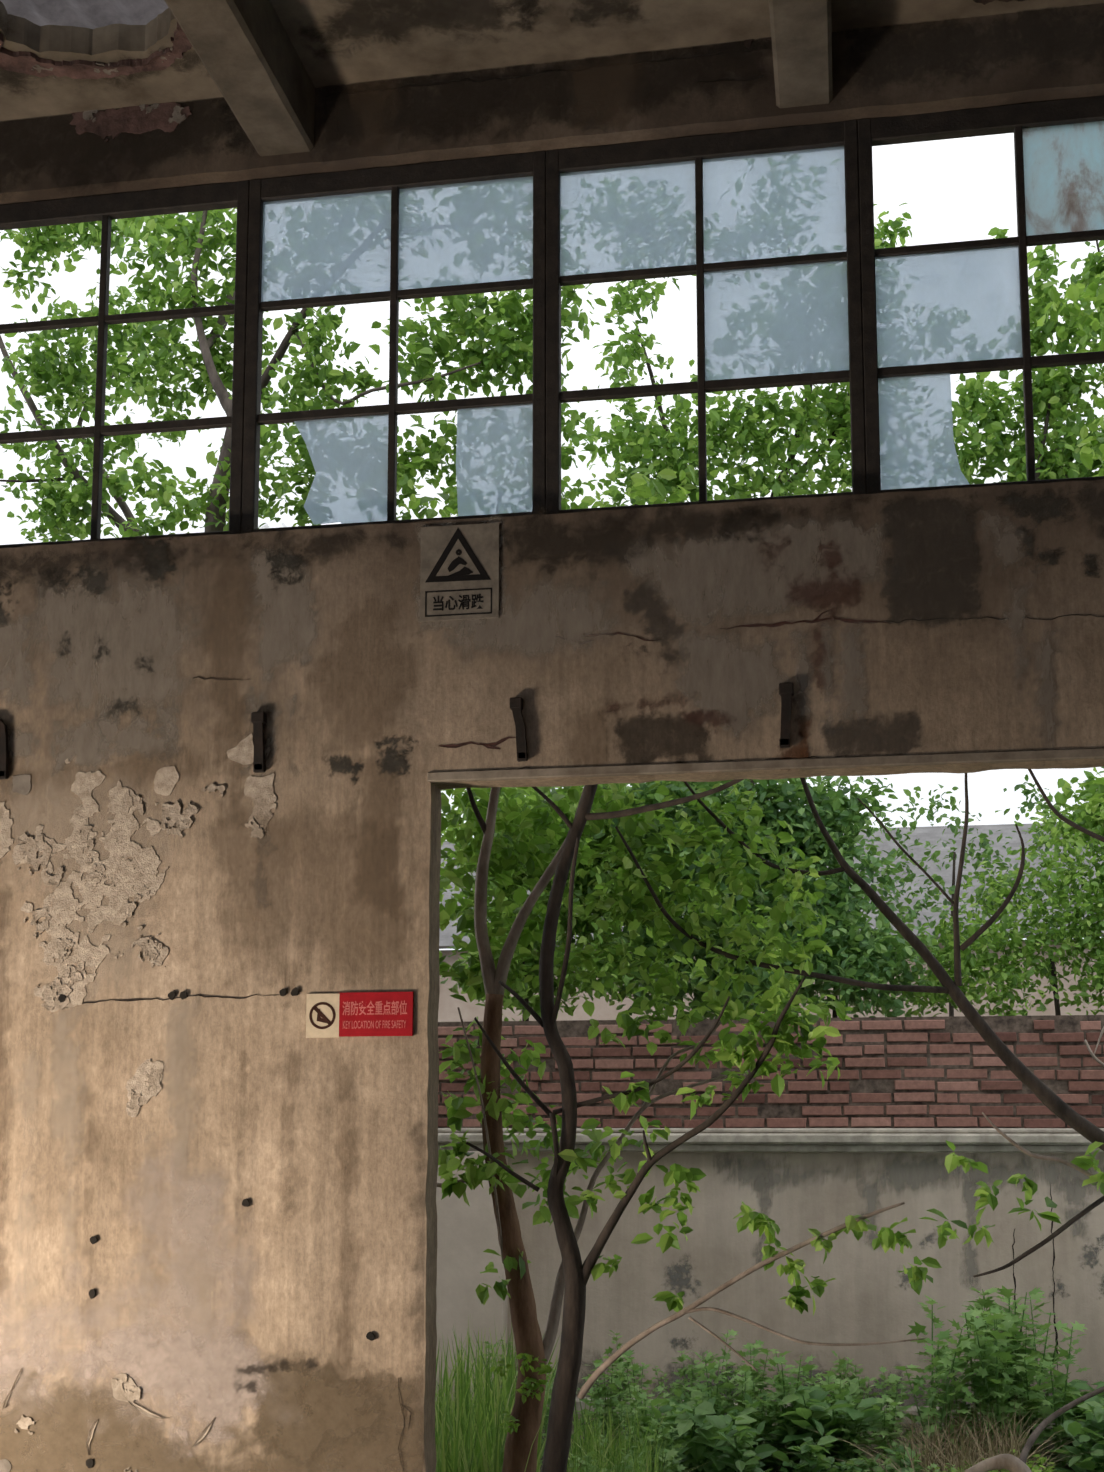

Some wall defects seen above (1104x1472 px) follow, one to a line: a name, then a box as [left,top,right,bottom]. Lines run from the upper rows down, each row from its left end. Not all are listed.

flaking render [0,22,192,79]
leakage [302,0,537,55]
flaking render [70,102,191,142]
leakage [446,489,1073,765]
peeling [227,734,254,765]
peeling [244,818,265,839]
peeling [0,758,226,1015]
crack [82,994,275,1004]
leakage [0,1326,423,1472]